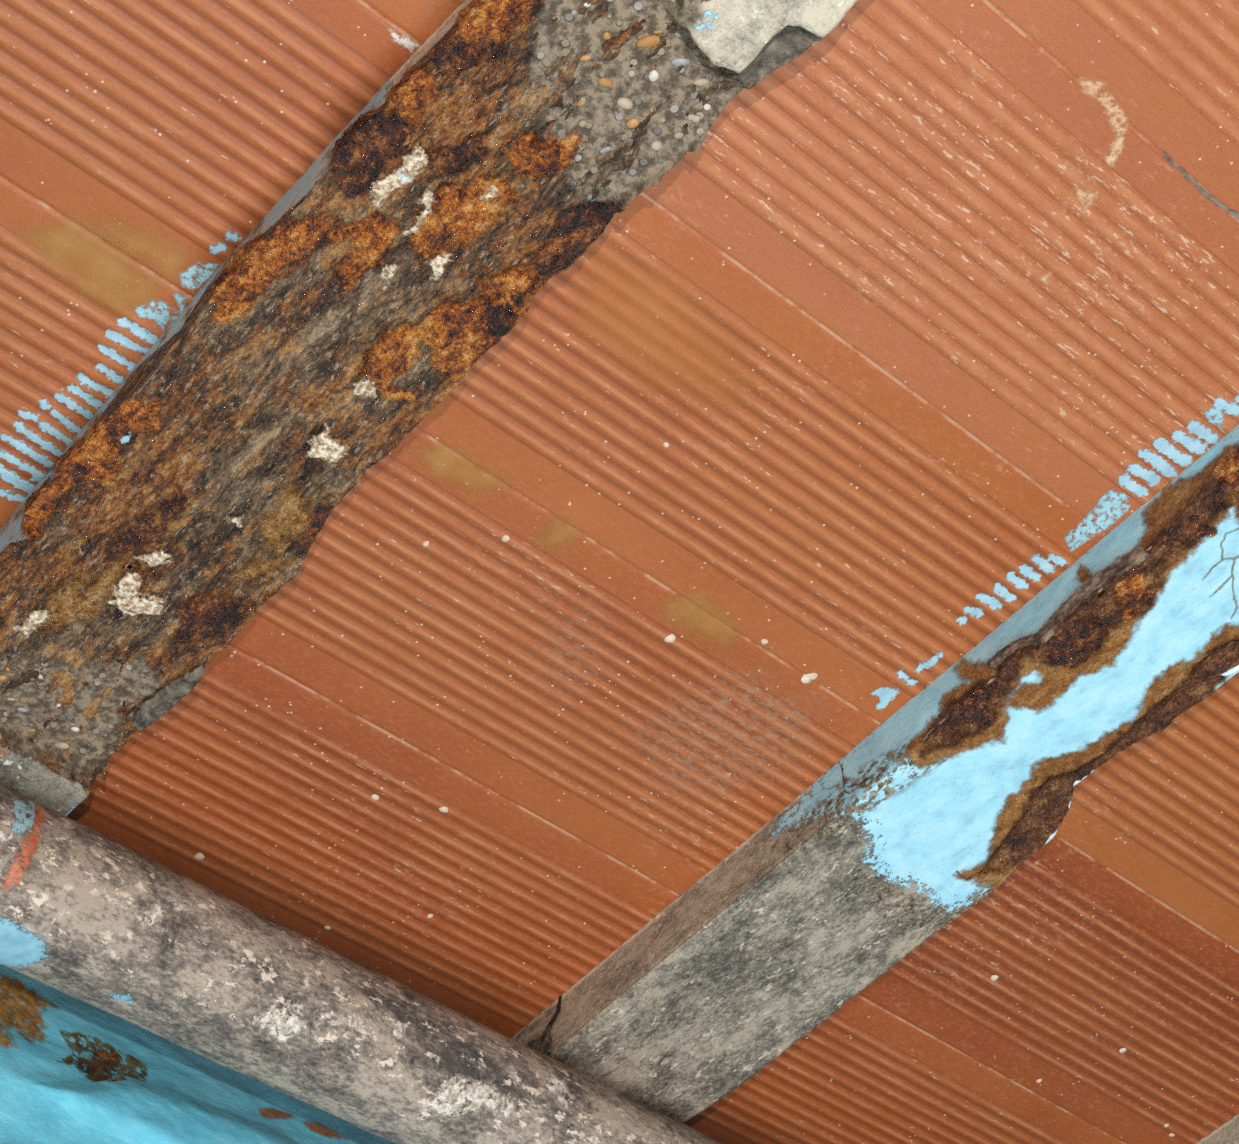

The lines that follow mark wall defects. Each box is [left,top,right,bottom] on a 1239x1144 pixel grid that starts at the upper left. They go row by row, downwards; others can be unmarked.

spalling [0,0,823,796]
peeling [769,424,1239,940]
corrosion [0,975,147,1082]